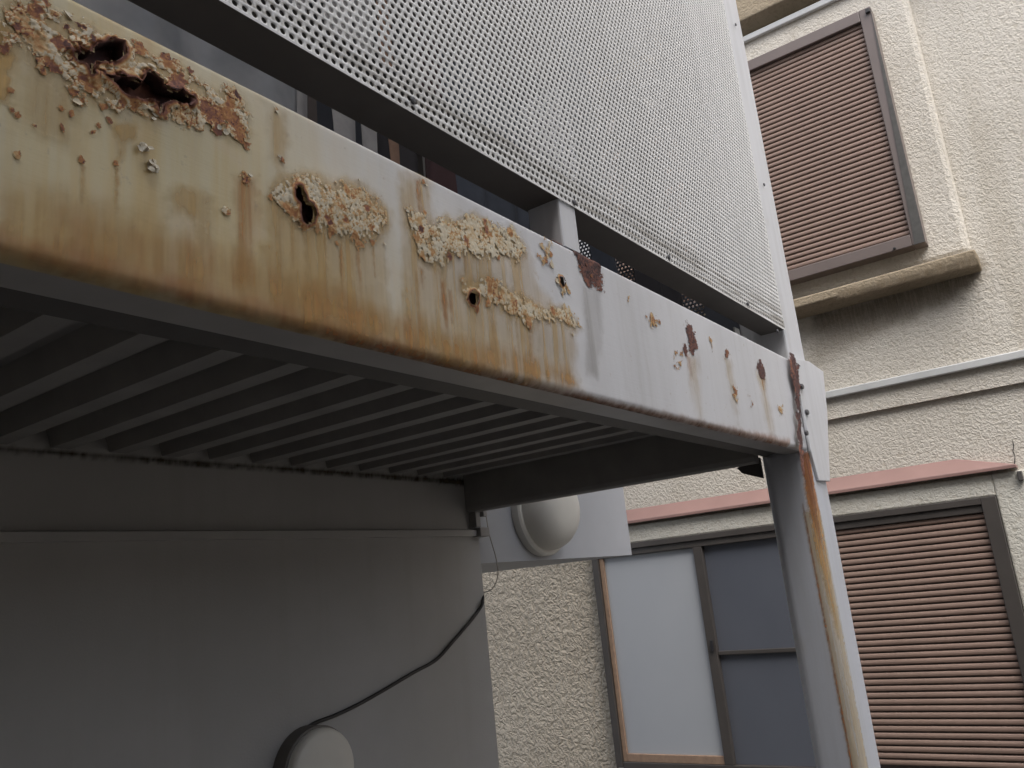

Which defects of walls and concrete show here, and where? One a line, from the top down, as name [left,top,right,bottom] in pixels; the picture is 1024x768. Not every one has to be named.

peeling [0,0,254,150]
rust [221,171,253,241]
peeling [267,172,387,266]
peeling [404,188,582,337]
rust [304,228,787,446]
rust [802,453,867,768]